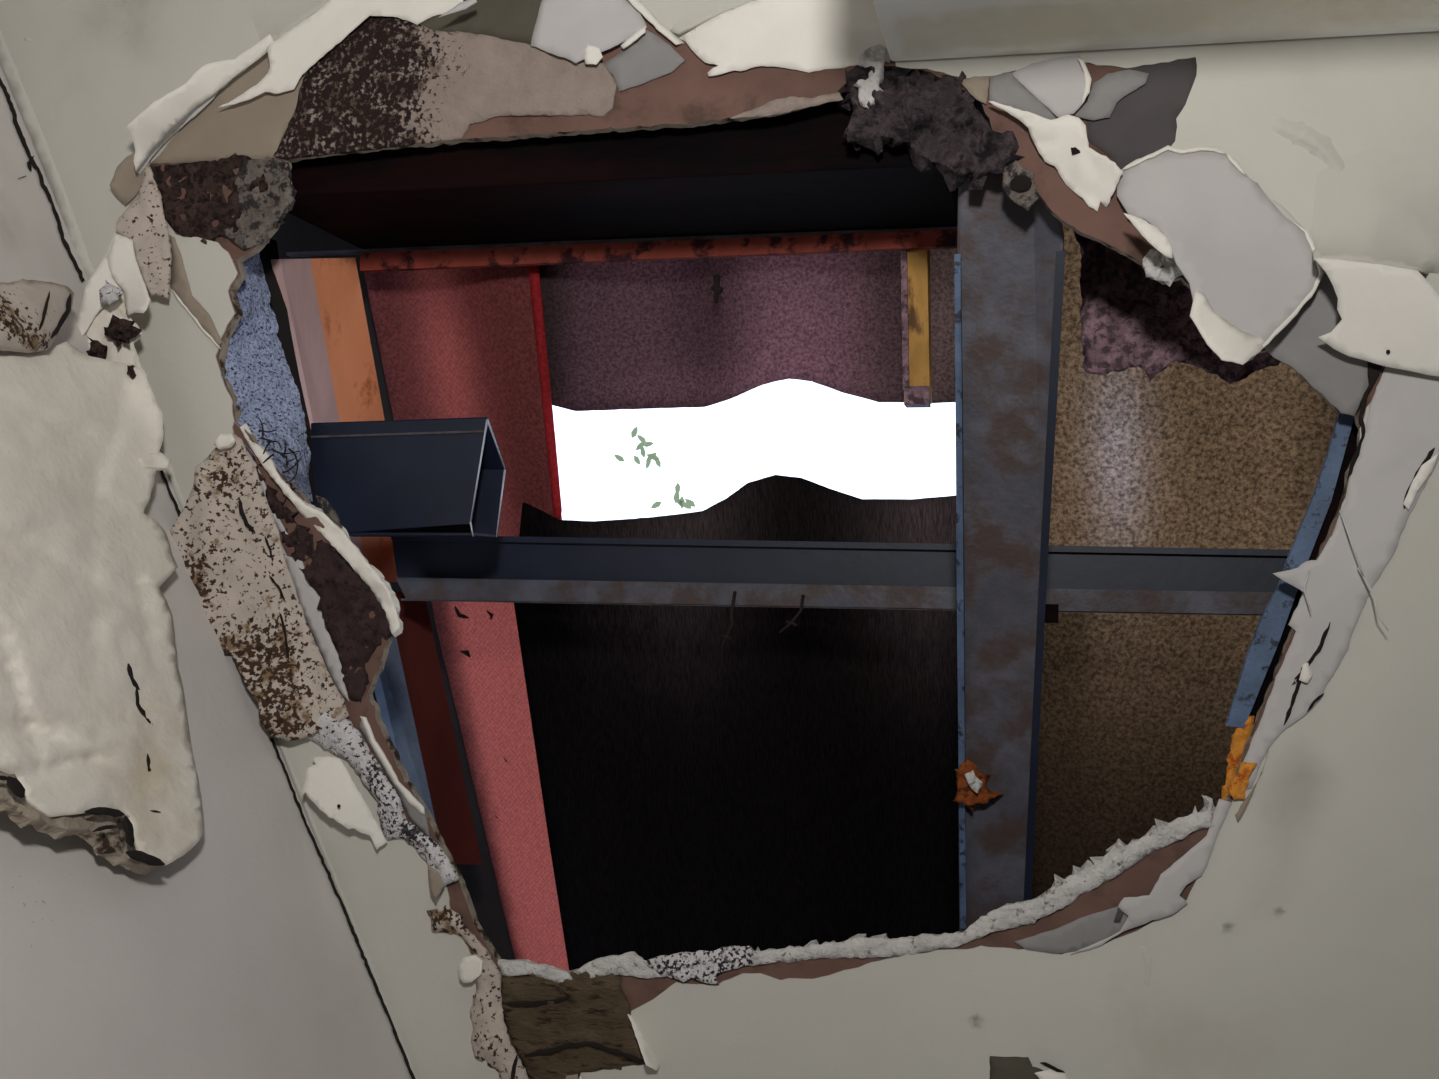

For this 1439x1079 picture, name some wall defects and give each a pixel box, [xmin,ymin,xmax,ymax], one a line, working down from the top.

peeling [77,231,150,359]
spalling [109,0,1439,849]
corrosion [953,759,1005,812]
corrosion [1221,716,1257,800]
peeling [428,865,444,901]
spalling [749,795,1232,966]
spalling [458,951,666,983]
peeling [627,1014,660,1071]
peeling [990,1056,1068,1079]